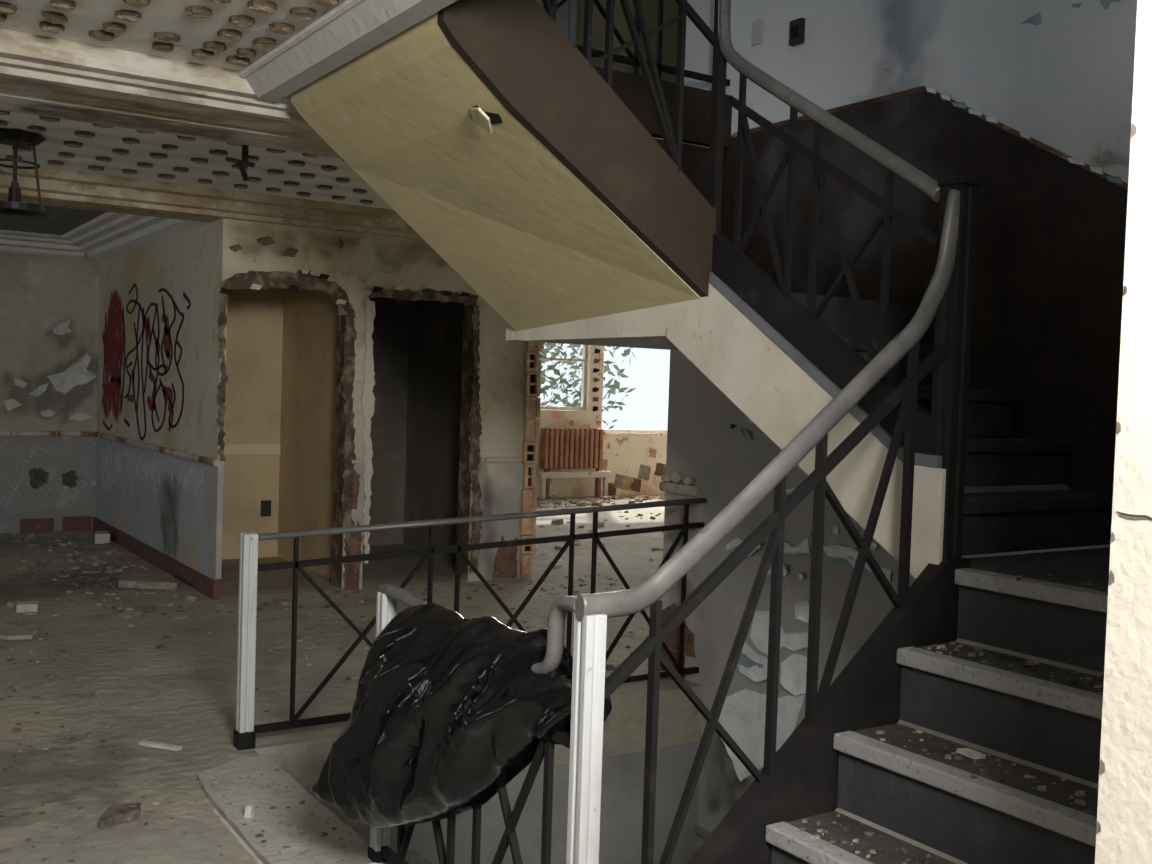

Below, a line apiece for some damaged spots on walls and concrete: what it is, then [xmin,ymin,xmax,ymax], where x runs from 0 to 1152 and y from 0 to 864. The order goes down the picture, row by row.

spalling [256,236,298,257]
peeling [4,349,98,422]
spalling [216,266,541,591]
peeling [726,538,761,558]
peeling [765,523,892,591]
crack [1118,509,1152,520]
peeling [718,599,809,782]